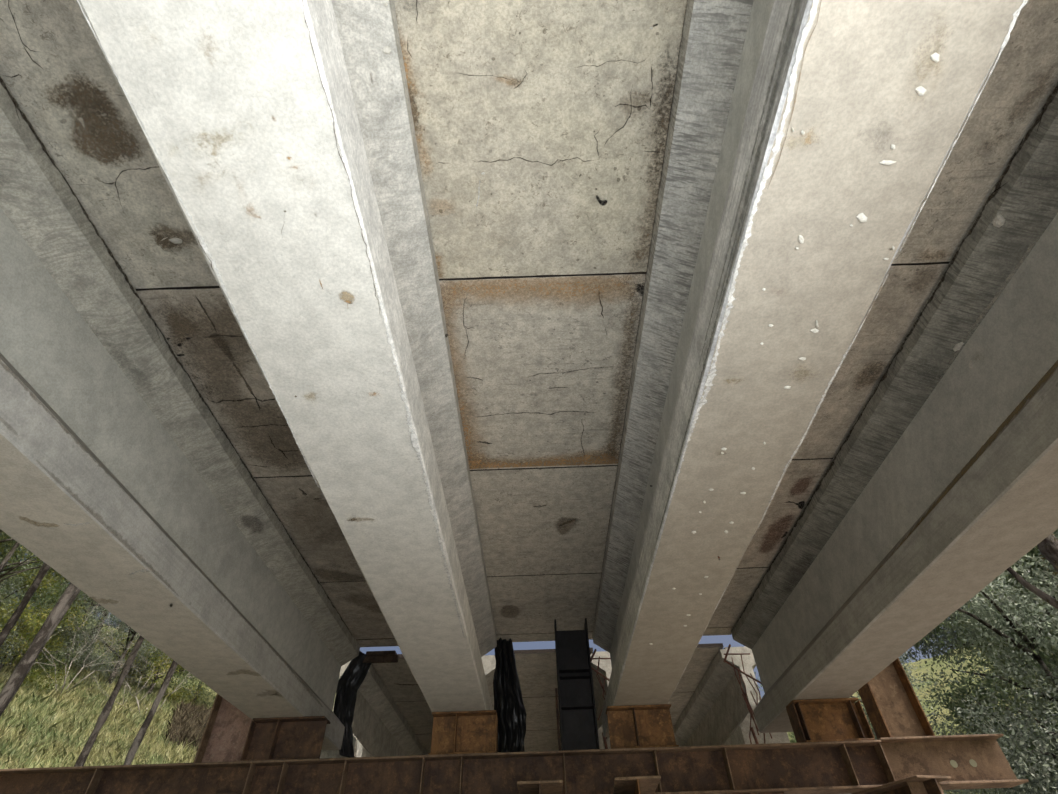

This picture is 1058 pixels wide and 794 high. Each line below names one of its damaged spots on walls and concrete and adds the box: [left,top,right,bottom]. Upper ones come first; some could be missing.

leakage [49,77,141,165]
corrosion [400,42,429,174]
leakage [152,225,197,249]
crack [0,0,352,635]
crack [479,0,688,614]
leakage [168,310,301,468]
corrosion [451,350,619,469]